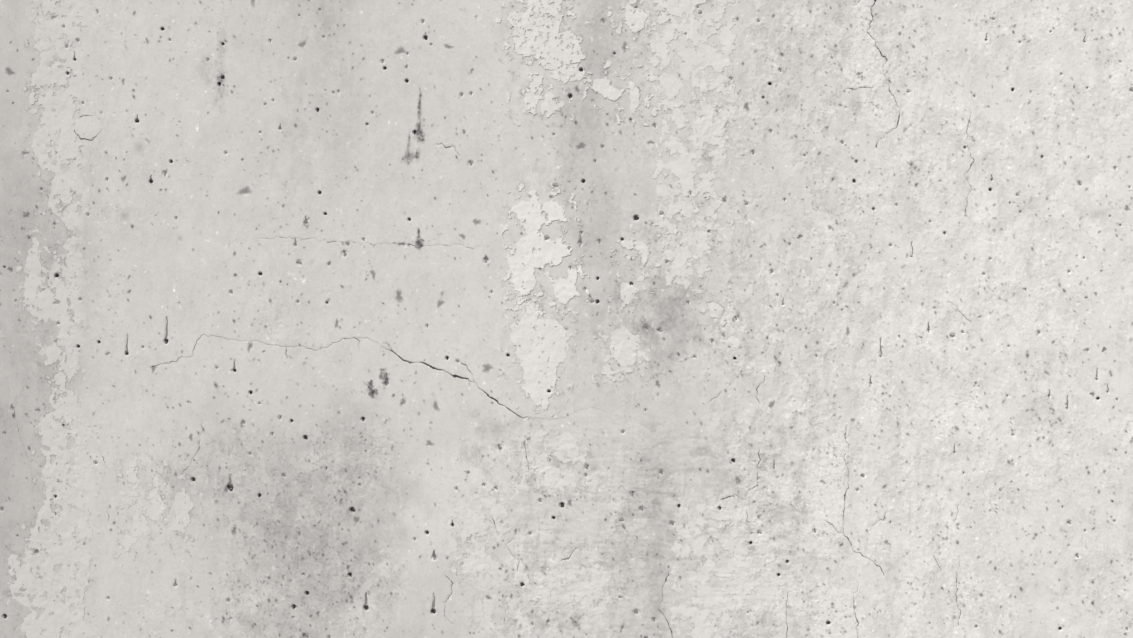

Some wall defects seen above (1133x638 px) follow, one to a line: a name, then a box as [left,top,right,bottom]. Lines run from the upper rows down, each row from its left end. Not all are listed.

crack [846,0,901,147]
peeling [495,0,741,384]
crack [152,334,601,481]
peeling [500,182,590,500]
peeling [445,491,513,579]
peeling [516,563,617,617]
crack [658,571,673,638]
crack [826,425,884,638]